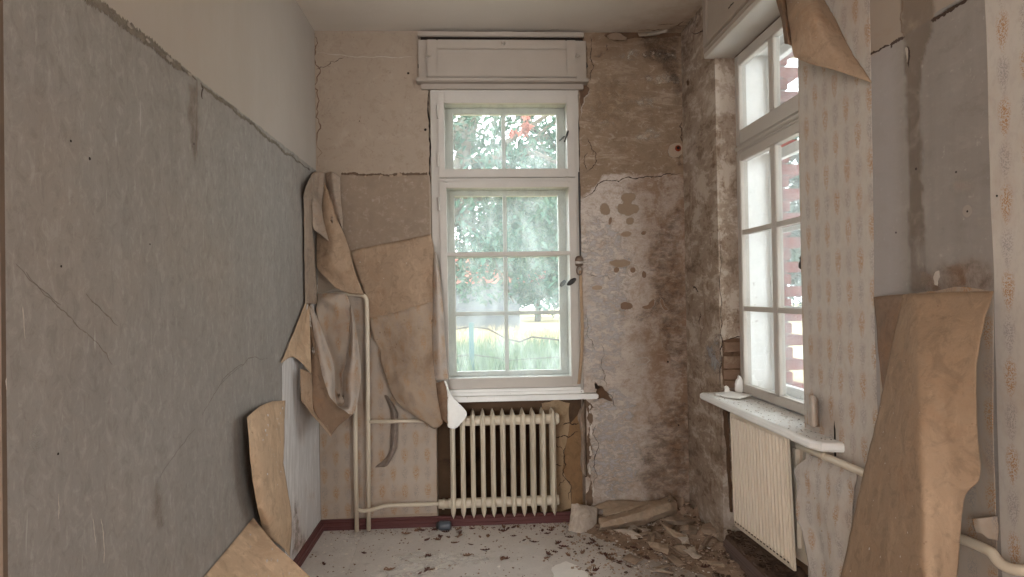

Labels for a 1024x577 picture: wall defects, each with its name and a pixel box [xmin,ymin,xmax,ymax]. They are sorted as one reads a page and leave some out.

crack [871,0,910,67]
crack [931,0,967,22]
crack [315,37,411,165]
peeling [599,192,646,237]
peeling [609,259,631,273]
peeling [620,299,655,310]
flaking render [714,233,752,512]
peeling [538,382,613,512]